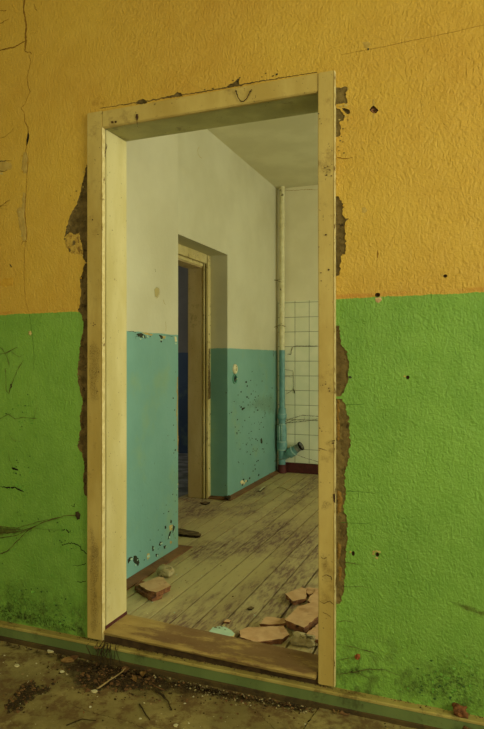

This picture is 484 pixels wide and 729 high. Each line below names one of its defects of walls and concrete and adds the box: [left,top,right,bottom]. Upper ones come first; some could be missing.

crack [0,0,37,348]
flaking render [64,167,87,507]
peeling [128,511,175,566]
flaking render [336,196,348,276]
flaking render [336,86,350,141]
flaking render [336,325,352,604]